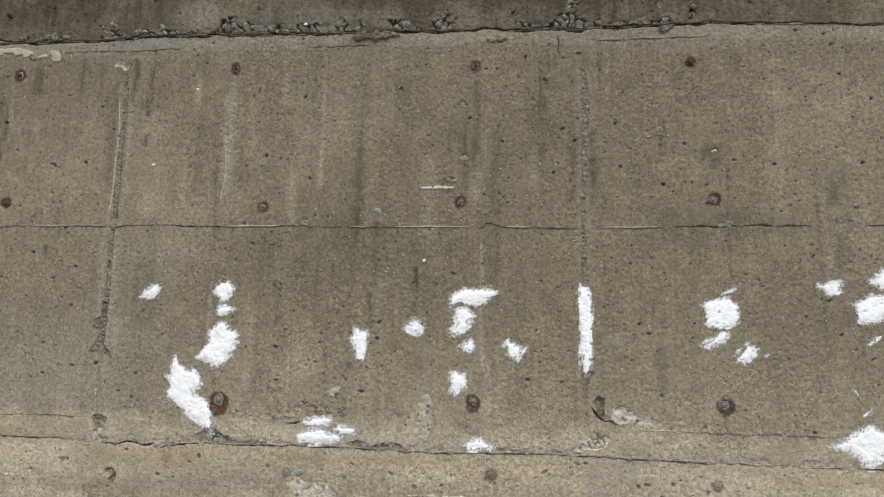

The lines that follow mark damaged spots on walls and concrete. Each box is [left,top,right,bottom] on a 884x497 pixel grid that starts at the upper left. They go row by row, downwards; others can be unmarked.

crack [0,22,884,54]
rust [209,392,228,416]
rust [466,394,480,412]
rust [717,399,735,416]
crack [1,413,76,438]
crack [86,441,707,465]